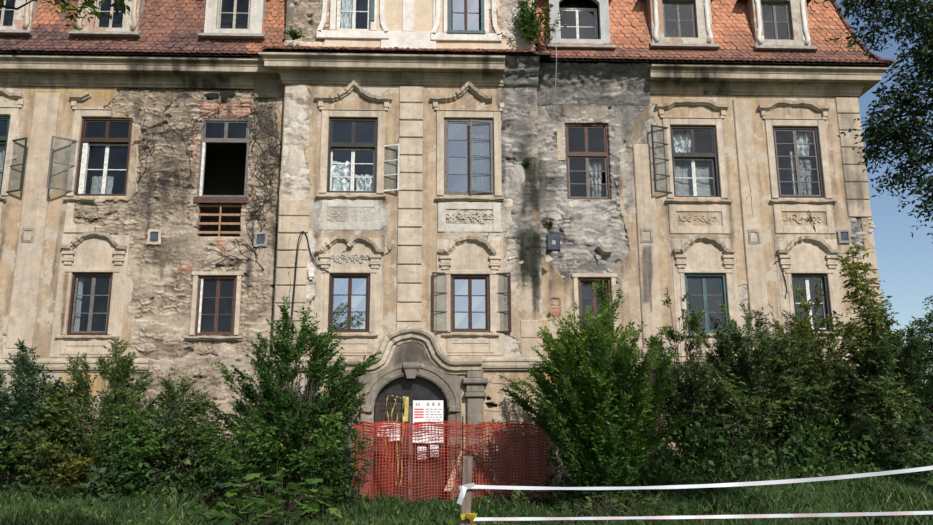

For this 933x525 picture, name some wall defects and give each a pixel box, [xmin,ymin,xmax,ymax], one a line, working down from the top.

flaking render [199,91,256,119]
flaking render [281,84,311,200]
damp [518,128,545,214]
flaking render [616,98,660,214]
damp [519,226,543,297]